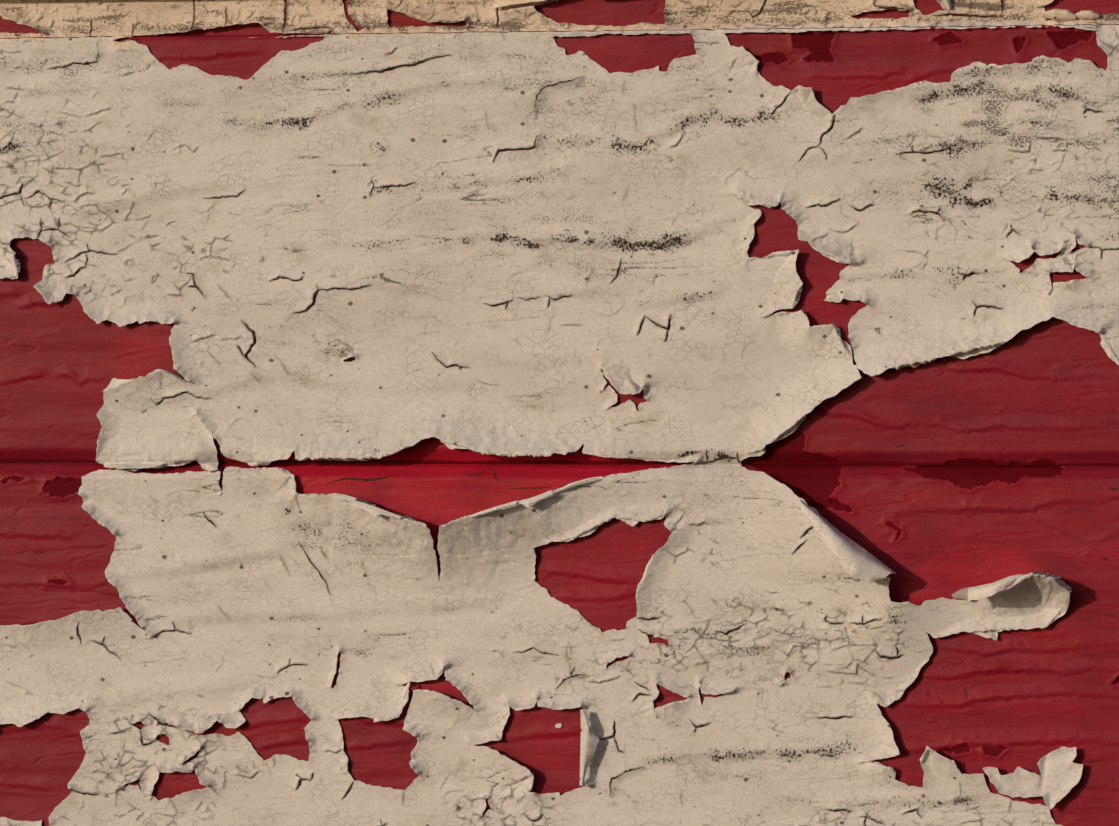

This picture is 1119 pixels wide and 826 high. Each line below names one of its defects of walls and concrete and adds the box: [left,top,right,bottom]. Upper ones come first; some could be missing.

peeling [108,15,336,88]
peeling [495,0,1119,123]
crack [0,181,108,278]
peeling [0,230,709,646]
peeling [733,190,1119,826]
peeling [0,702,98,826]
peeling [146,763,218,810]
peeling [171,658,485,800]
peeling [464,691,599,803]
crack [829,809,920,826]